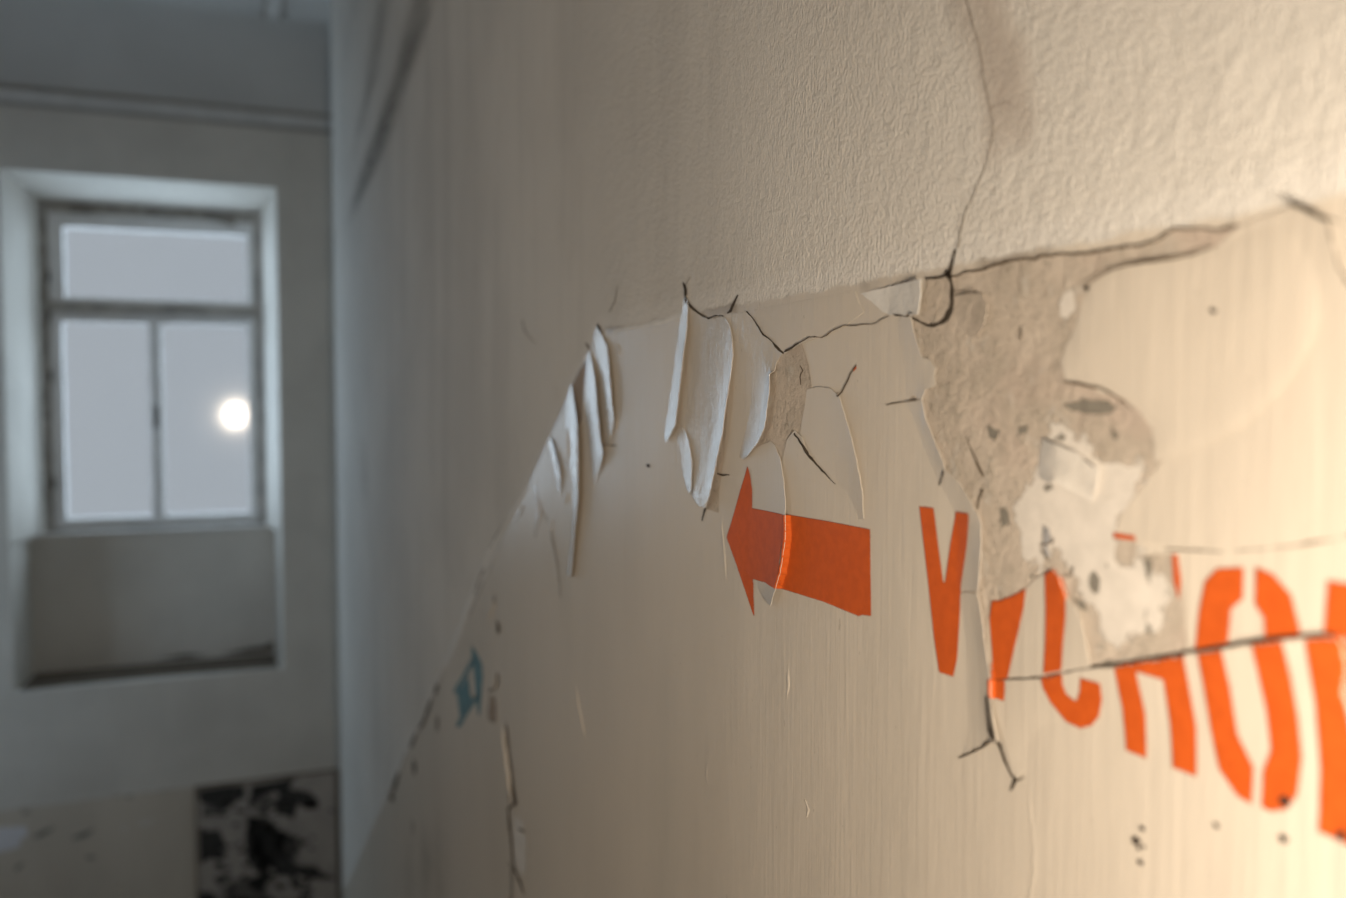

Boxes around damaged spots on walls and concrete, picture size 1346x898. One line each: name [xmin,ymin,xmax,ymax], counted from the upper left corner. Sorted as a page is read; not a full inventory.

crack [893,0,1016,328]
flaking render [514,225,1239,756]
crack [1040,537,1074,578]
crack [488,670,527,898]
crack [959,632,1335,898]